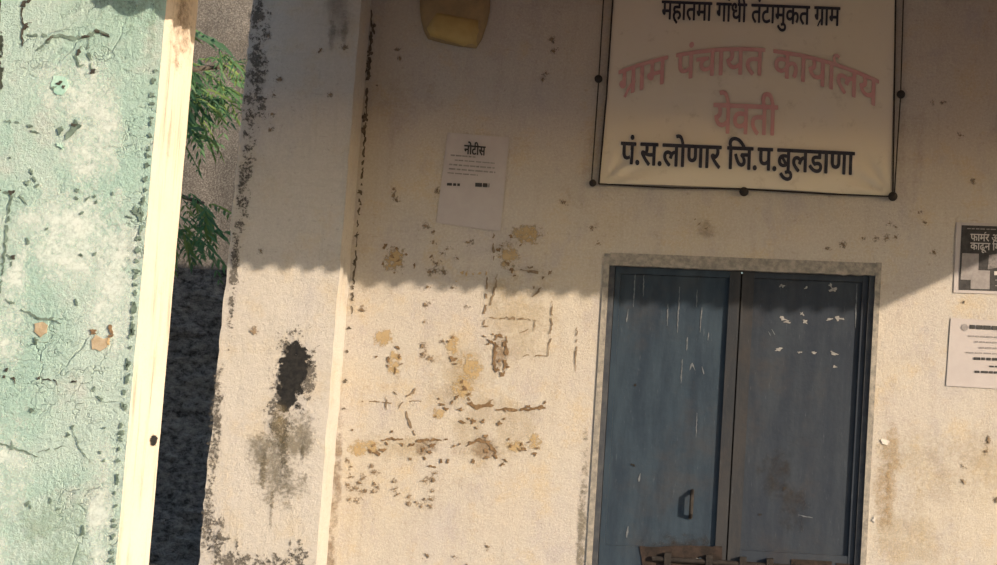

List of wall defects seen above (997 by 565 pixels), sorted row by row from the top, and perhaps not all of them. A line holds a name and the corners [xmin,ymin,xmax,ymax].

peeling [382,244,415,274]
peeling [423,225,487,291]
peeling [496,225,542,277]
spalling [33,322,48,345]
crack [0,429,90,461]
damp [201,368,308,565]
damp [250,325,320,515]
peeling [344,330,542,509]